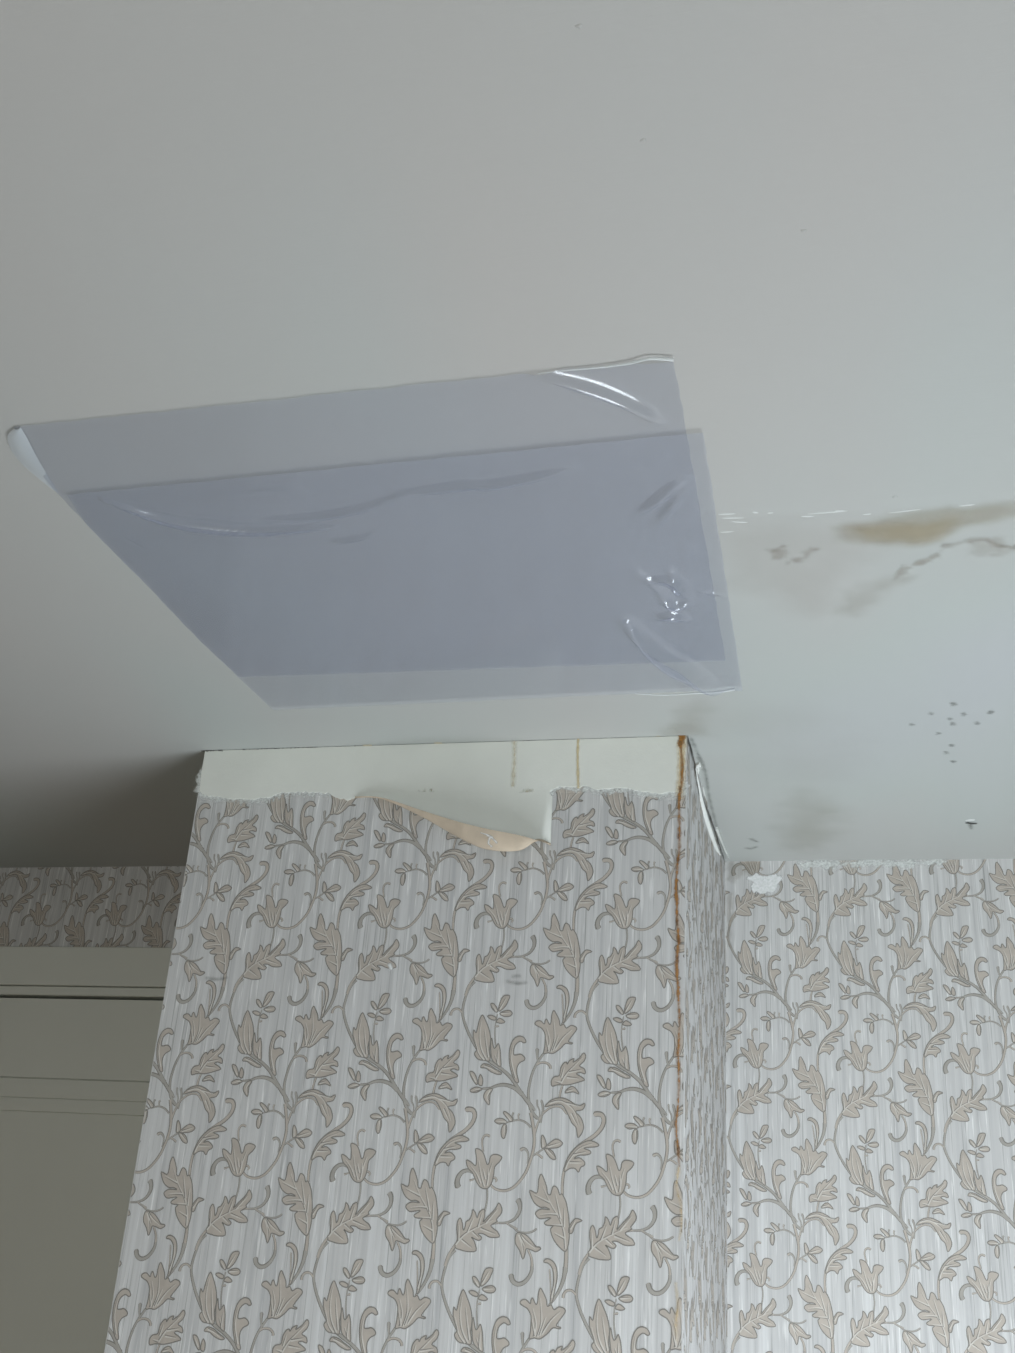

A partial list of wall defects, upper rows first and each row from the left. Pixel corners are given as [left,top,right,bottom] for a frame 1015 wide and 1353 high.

corrosion [674,735,685,1157]